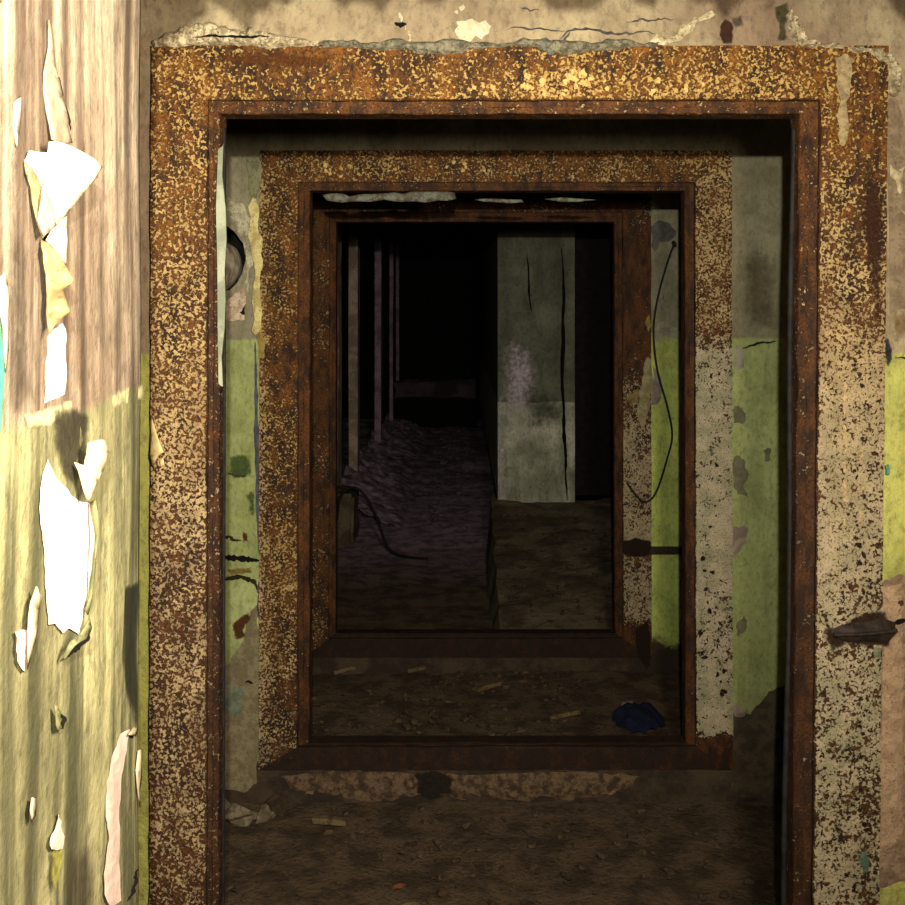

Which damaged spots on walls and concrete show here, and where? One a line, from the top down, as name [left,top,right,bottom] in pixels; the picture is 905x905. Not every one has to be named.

peeling [24,20,103,403]
corrosion [862,182,883,317]
peeling [0,271,9,372]
peeling [15,439,110,671]
corrosion [233,614,250,639]
corrosion [622,537,651,582]
corrosion [824,627,889,650]
corrosion [855,542,873,595]
corrosion [847,612,887,624]
spalling [860,574,905,888]
peeling [50,815,64,888]
peeling [104,727,142,905]